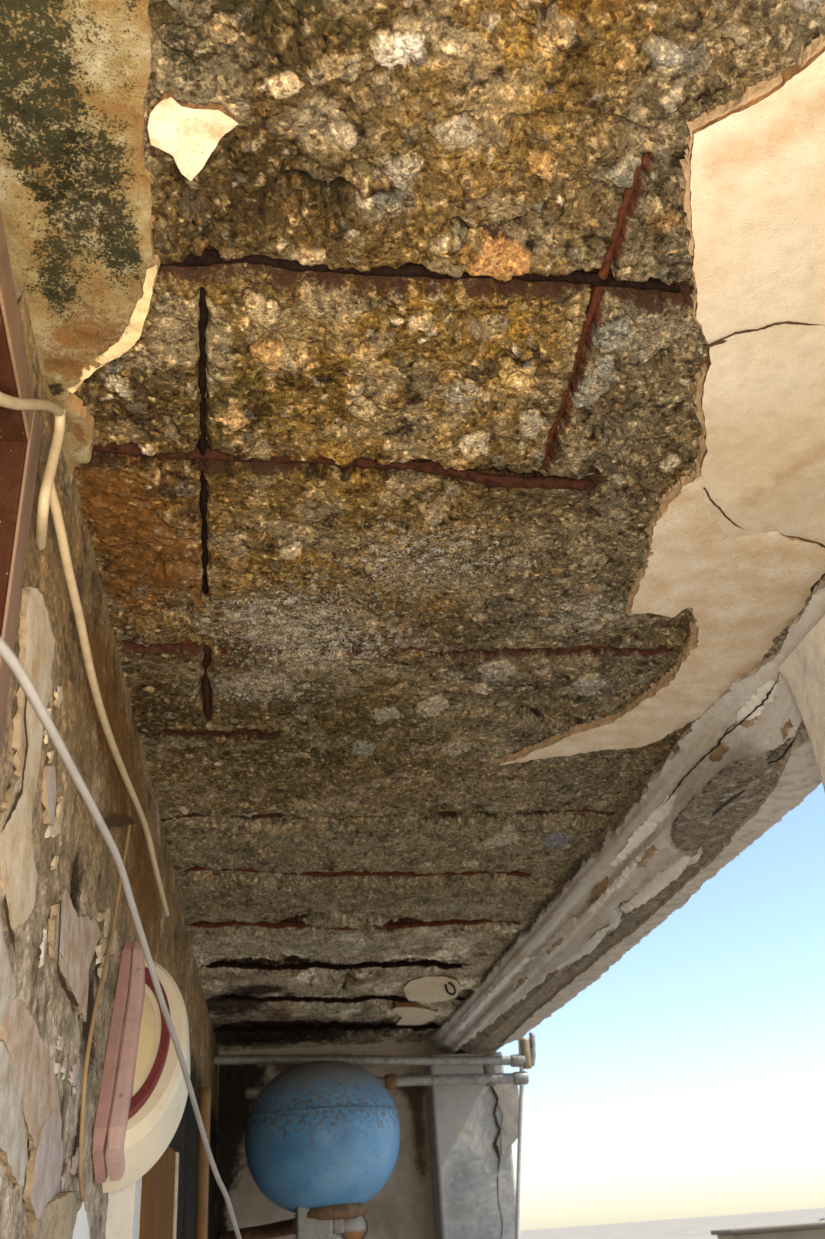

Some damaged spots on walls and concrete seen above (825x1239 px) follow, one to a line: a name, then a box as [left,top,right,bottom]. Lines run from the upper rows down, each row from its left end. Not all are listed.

leakage [0,0,234,401]
leakage [286,165,355,208]
corrosion [44,302,125,379]
corrosion [68,153,694,494]
crack [703,321,820,350]
spalling [67,0,825,1052]
crack [703,487,744,530]
corrosion [88,624,675,965]
flaking render [0,586,80,1222]
peeling [38,888,118,1022]
peeling [72,1200,90,1239]
crack [490,1086,503,1237]